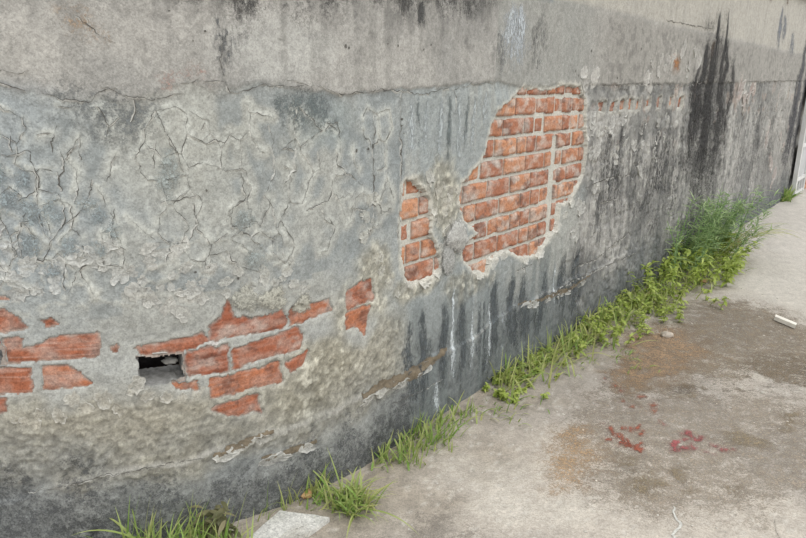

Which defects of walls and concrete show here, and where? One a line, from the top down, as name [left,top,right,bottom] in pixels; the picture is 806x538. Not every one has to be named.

crack [0,43,494,295]
leakage [395,0,425,24]
flaking render [345,36,702,336]
leakage [594,13,736,220]
leakage [777,7,794,52]
leakage [782,41,806,168]
flaking render [0,212,333,430]
leakage [0,250,582,538]
spalling [360,347,447,407]